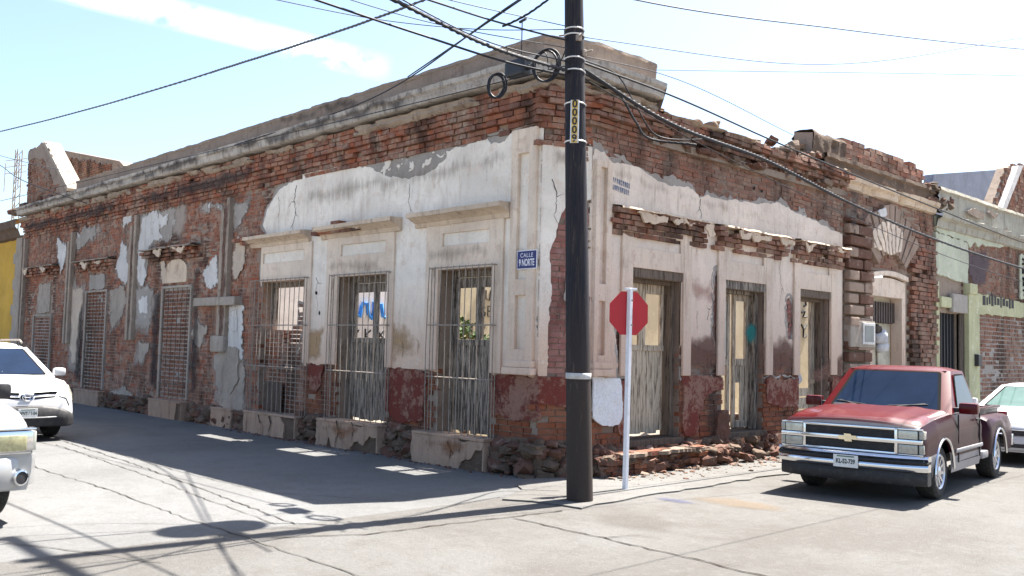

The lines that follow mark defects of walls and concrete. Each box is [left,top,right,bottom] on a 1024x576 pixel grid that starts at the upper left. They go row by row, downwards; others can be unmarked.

spalling [378,152,447,176]
spalling [586,126,844,237]
peeling [739,229,817,253]
spalling [22,186,274,411]
spalling [547,209,566,377]
spalling [302,364,341,415]
spalling [385,368,443,430]
spalling [674,348,723,440]
spalling [758,363,799,434]